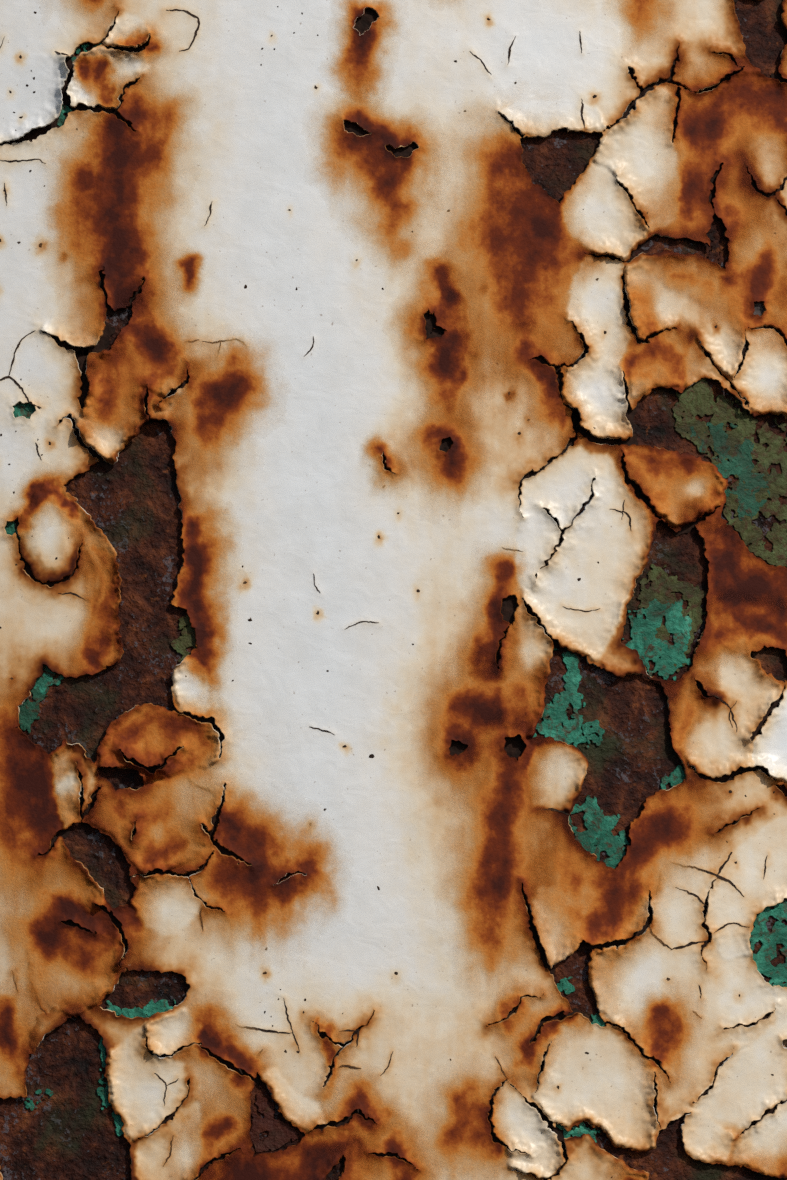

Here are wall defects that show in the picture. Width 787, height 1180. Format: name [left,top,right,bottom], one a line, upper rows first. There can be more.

crack [0,270,145,471]
peeling [0,925,203,1180]
peeling [19,362,222,937]
rust [49,28,271,471]
rust [0,694,338,1093]
rust [322,0,591,500]
crack [488,884,579,1180]
rust [428,551,710,987]
peeling [491,817,787,1180]
peeling [498,87,787,869]
crack [578,808,773,1104]
crack [690,678,787,783]